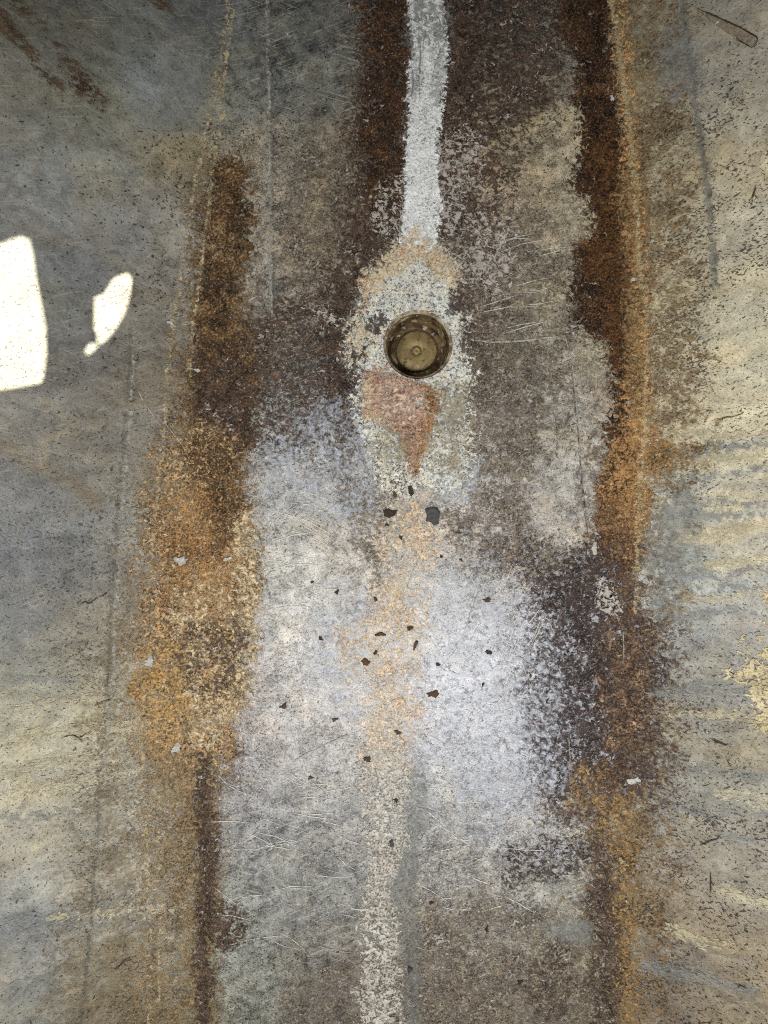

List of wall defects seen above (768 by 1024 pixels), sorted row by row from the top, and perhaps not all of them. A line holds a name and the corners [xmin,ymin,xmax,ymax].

corrosion [0,0,109,113]
corrosion [42,0,445,1024]
leakage [252,0,567,1024]
corrosion [264,0,723,1024]